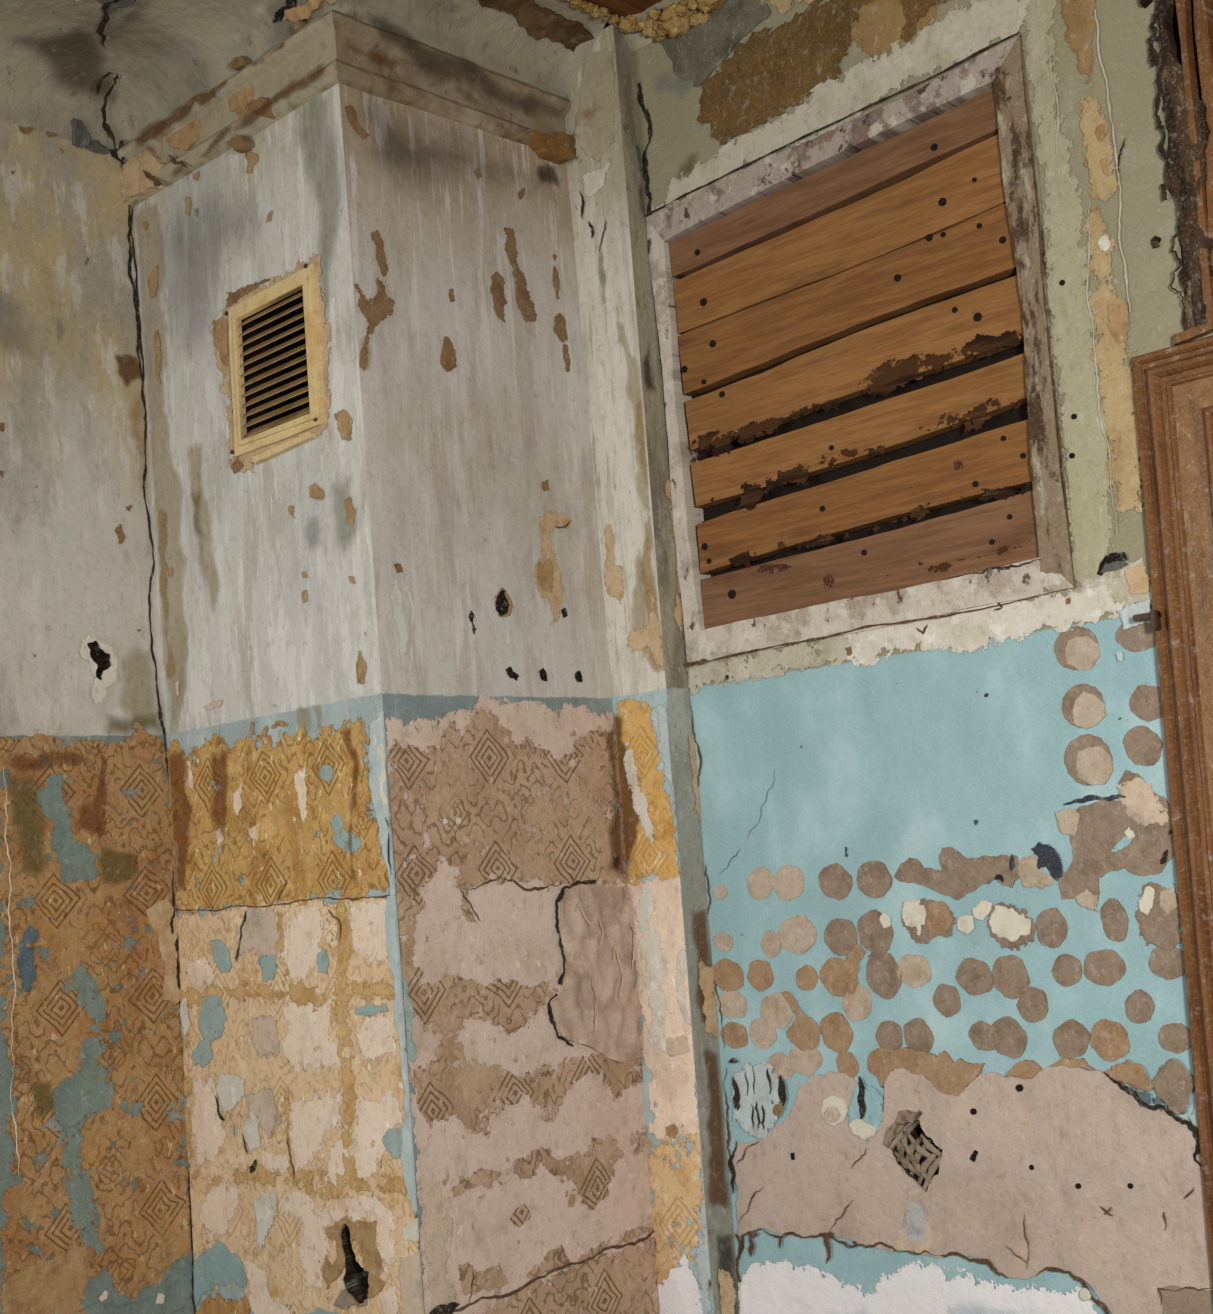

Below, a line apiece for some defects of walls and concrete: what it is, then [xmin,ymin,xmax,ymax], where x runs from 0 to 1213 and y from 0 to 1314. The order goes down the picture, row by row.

flaking render [849,0,941,58]
crack [96,0,119,157]
peeling [228,83,276,119]
peeling [227,134,258,174]
flaking render [1140,0,1194,328]
flaking render [79,635,118,704]
peeling [1017,842,1063,889]
peeling [879,898,926,936]
peeling [957,901,1031,942]
flaking render [0,695,736,1314]
flaking render [728,1047,1213,1314]
crack [429,1230,654,1314]